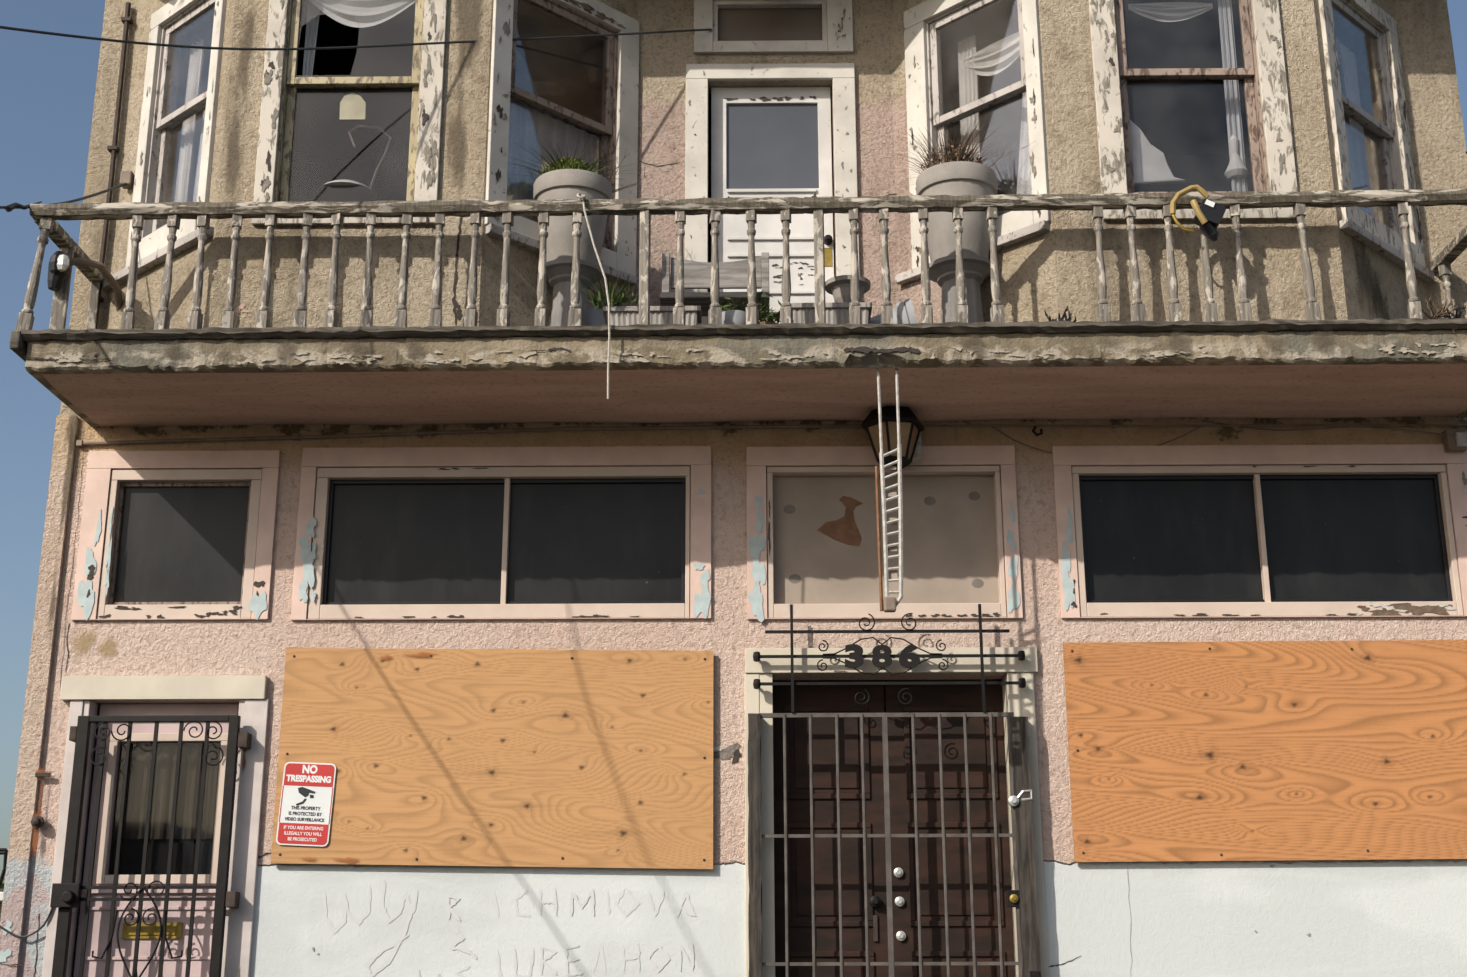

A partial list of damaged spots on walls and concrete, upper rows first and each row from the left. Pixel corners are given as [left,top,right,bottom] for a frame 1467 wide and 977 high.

peeling [1096,0,1116,66]
peeling [493,73,509,125]
peeling [1274,138,1285,191]
crack [452,217,462,325]
peeling [237,351,382,365]
peeling [421,350,536,363]
peeling [601,352,667,363]
peeling [760,350,827,360]
peeling [1147,345,1215,358]
peeling [1379,341,1456,357]
peeling [78,508,267,621]
peeling [1328,601,1456,616]